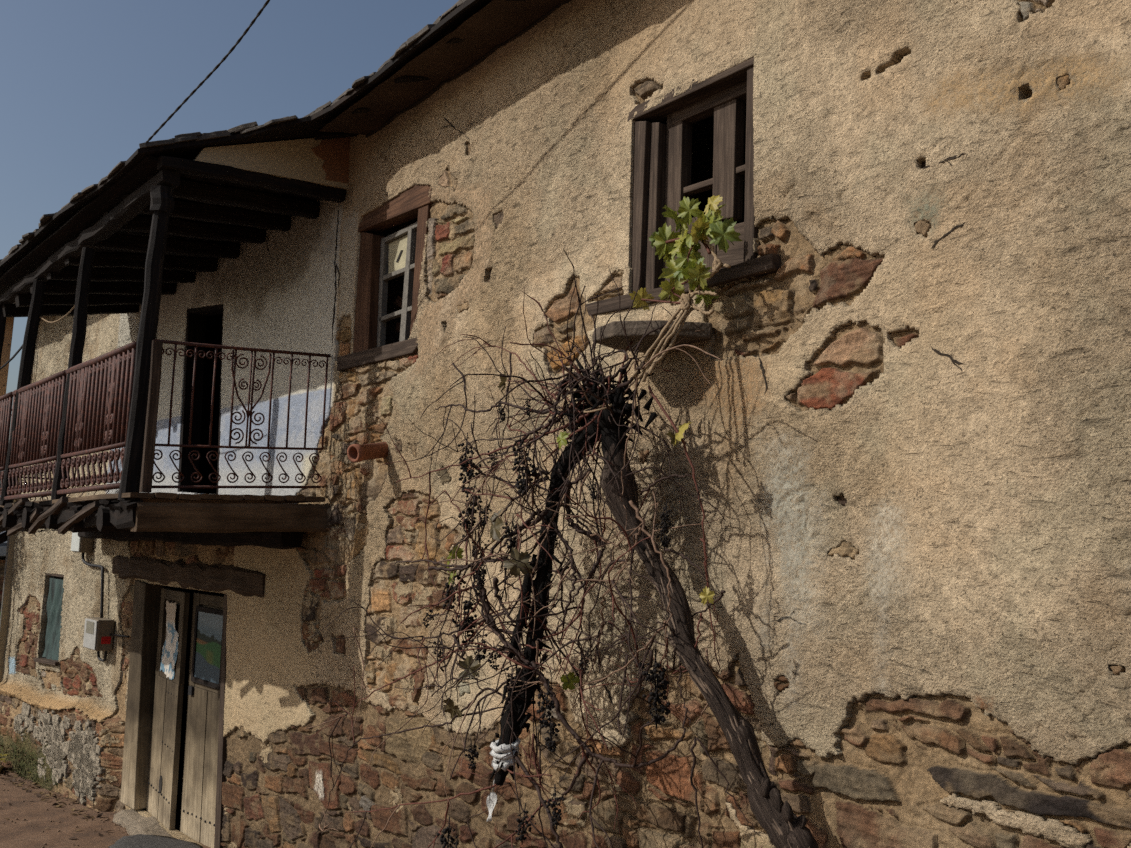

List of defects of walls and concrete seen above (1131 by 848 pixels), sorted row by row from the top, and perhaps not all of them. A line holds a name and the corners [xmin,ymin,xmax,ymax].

flaking render [1018,0,1055,21]
crack [331,217,340,349]
flaking render [427,166,475,302]
flaking render [533,271,624,374]
flaking render [706,218,885,360]
flaking render [786,321,919,411]
flaking render [297,353,419,655]
flaking render [436,467,452,484]
flaking render [0,578,138,813]
flaking render [214,491,767,848]
flaking render [709,660,1131,848]